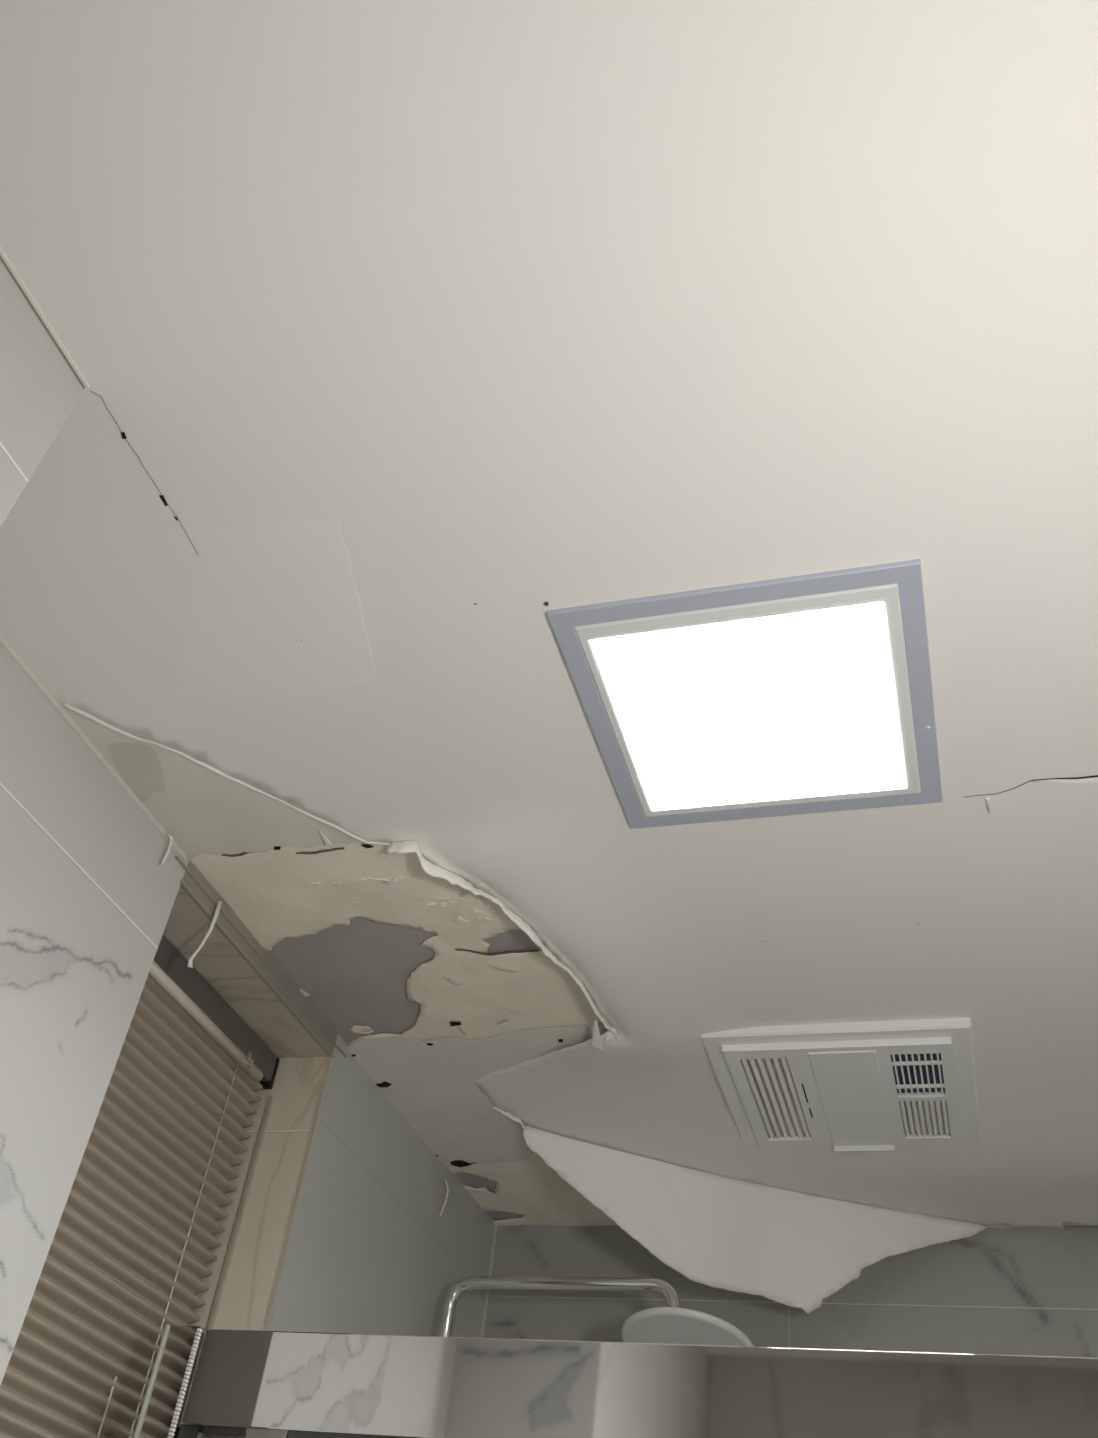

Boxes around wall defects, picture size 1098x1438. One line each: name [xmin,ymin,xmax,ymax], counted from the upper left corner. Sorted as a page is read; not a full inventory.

peeling [0,246,90,389]
crack [91,391,199,556]
crack [964,775,1098,814]
peeling [62,703,1009,1314]